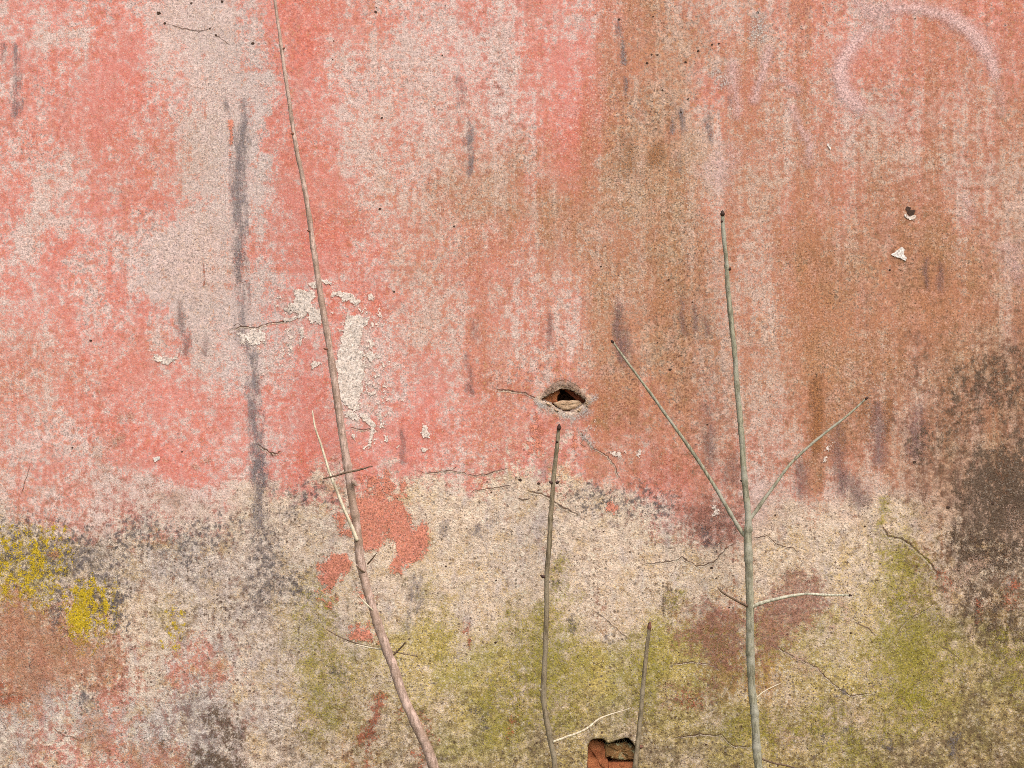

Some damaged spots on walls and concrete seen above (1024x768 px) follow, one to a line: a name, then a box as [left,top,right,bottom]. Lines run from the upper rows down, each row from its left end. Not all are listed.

leakage [229,101,346,623]
peeling [237,279,407,449]
spalling [536,384,595,447]
leakage [906,346,1024,659]
spalling [581,732,644,768]